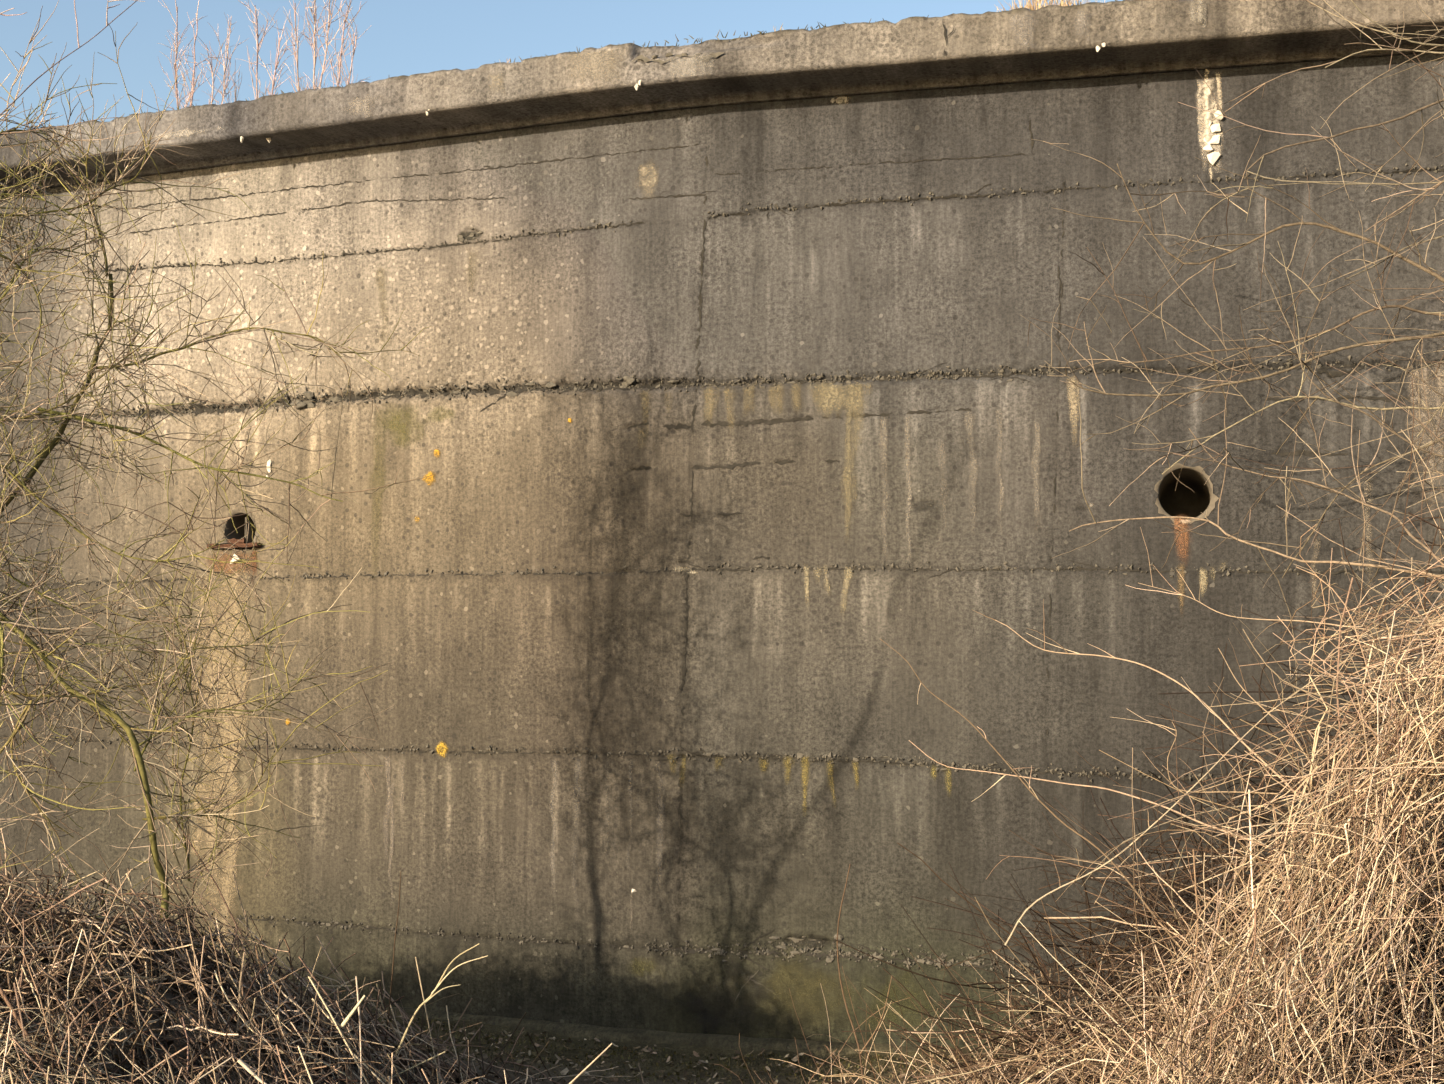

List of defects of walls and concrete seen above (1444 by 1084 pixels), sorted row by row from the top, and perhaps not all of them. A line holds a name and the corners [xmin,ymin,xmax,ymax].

water stain [1198,69,1223,179]
water stain [770,383,862,526]
water stain [1068,378,1079,428]
water stain [804,567,852,606]
corrosion [1174,518,1190,605]
water stain [384,758,402,865]